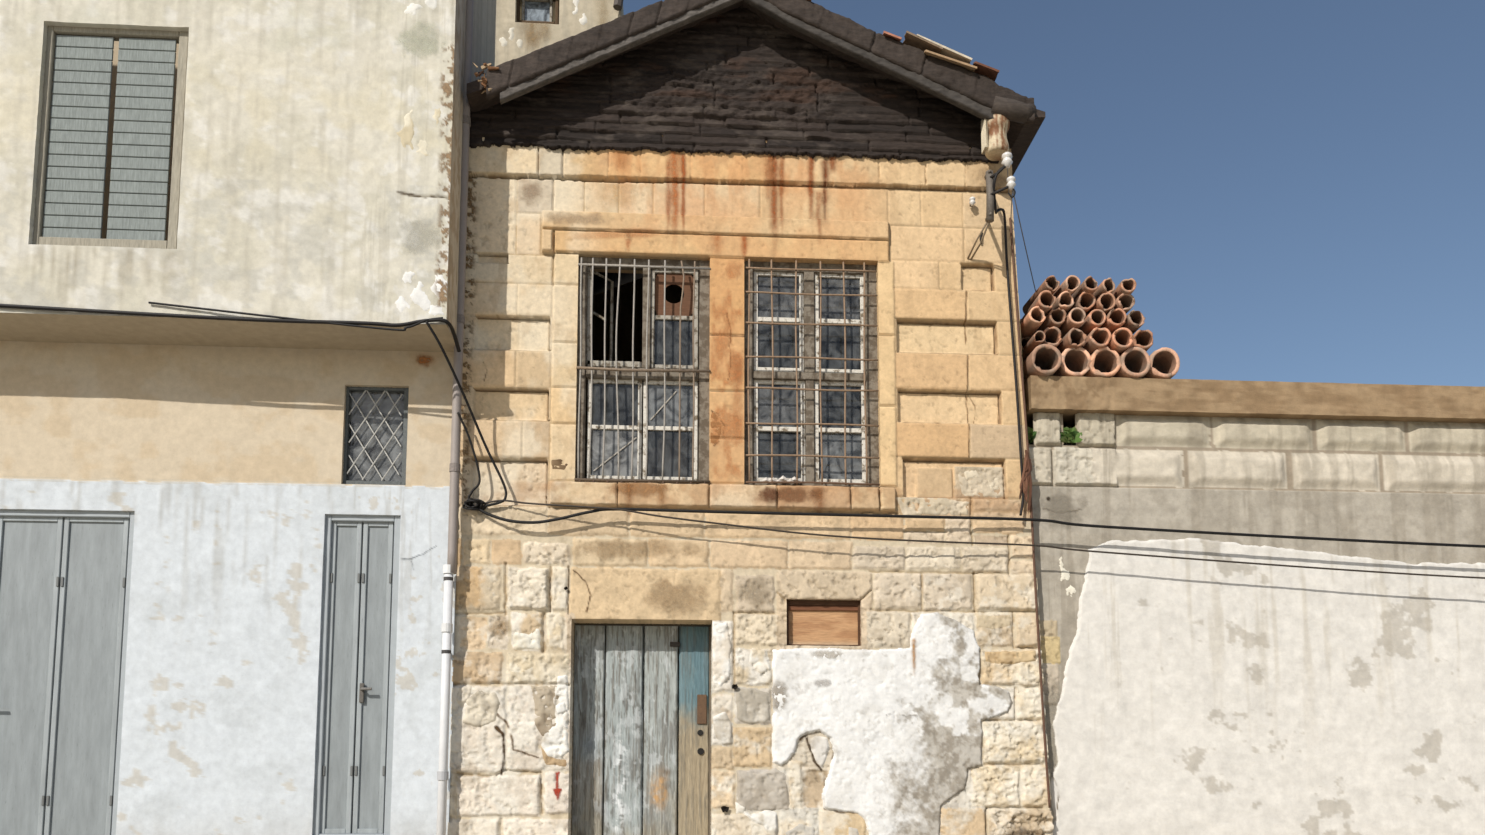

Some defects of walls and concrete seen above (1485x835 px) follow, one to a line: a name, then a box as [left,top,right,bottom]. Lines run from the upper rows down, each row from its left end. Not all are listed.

peeling [404,0,437,15]
peeling [499,27,523,48]
peeling [572,0,587,25]
peeling [395,46,475,316]
corrosion [668,152,685,221]
corrosion [772,157,783,224]
corrosion [808,157,835,203]
spalling [459,325,471,499]
flaking render [712,622,732,688]
flaking render [713,712,734,745]
flaking render [749,612,1013,835]
flaking render [735,802,779,835]